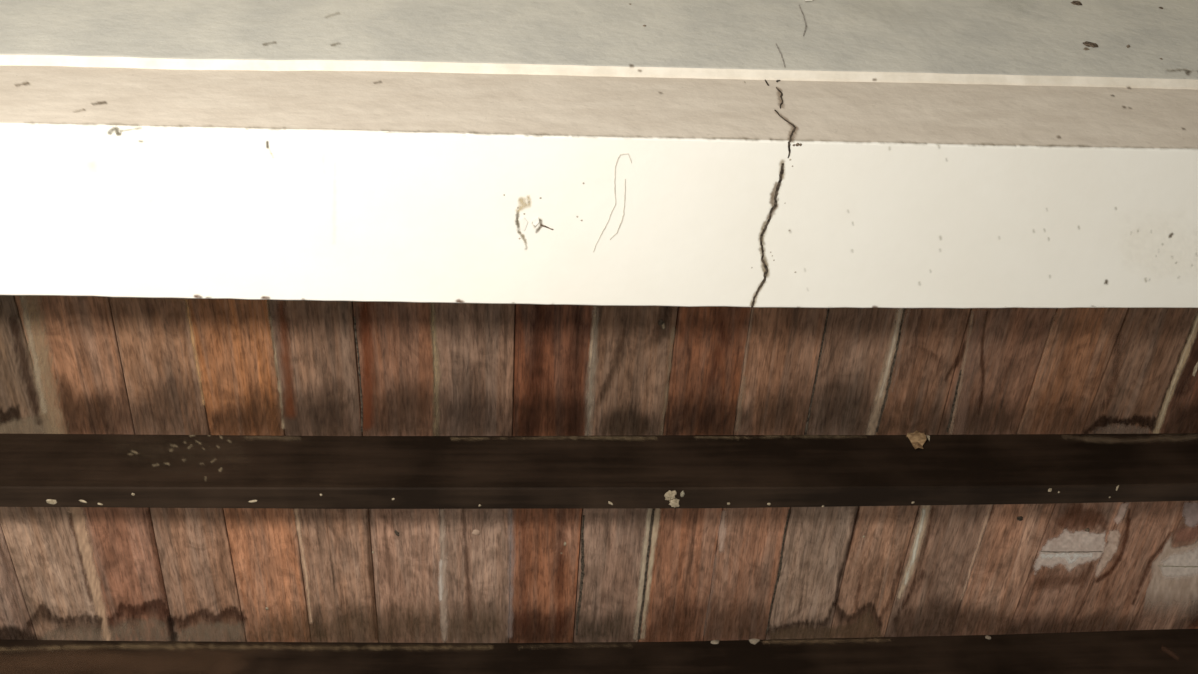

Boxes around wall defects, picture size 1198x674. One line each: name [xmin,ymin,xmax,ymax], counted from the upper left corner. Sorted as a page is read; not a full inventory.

crack [744,0,812,307]
water stain [0,507,246,642]
water stain [768,510,881,640]
peeling [1034,504,1130,605]
peeling [1134,502,1198,601]